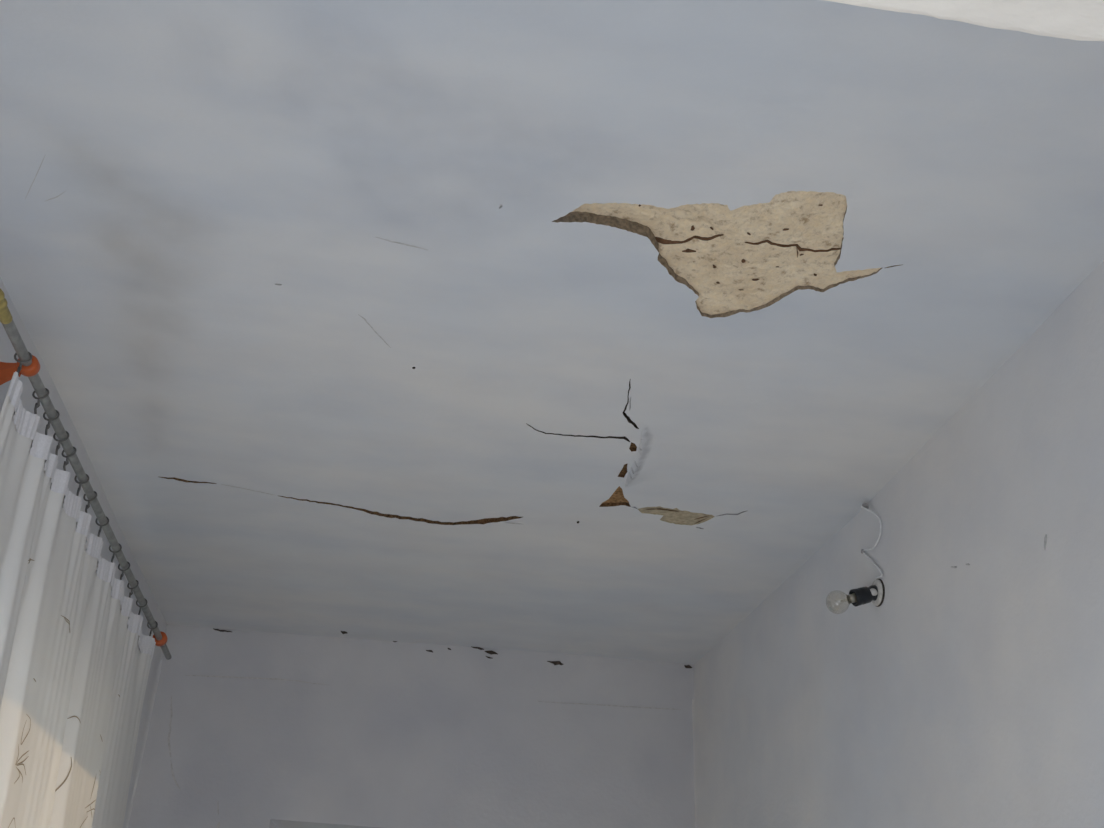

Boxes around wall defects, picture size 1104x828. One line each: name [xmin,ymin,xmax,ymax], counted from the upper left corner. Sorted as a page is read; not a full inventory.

flaking render [552,191,900,318]
crack [526,381,639,478]
crack [161,477,522,525]
flaking render [599,486,746,529]